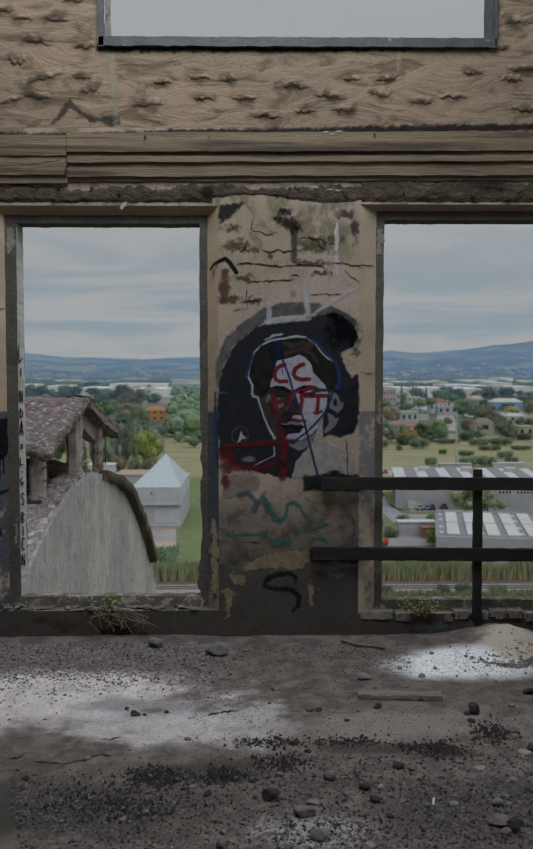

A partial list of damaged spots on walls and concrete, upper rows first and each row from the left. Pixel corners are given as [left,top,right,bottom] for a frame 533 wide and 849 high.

spalling [0,180,362,209]
crack [233,218,375,311]
flaking render [210,519,310,620]